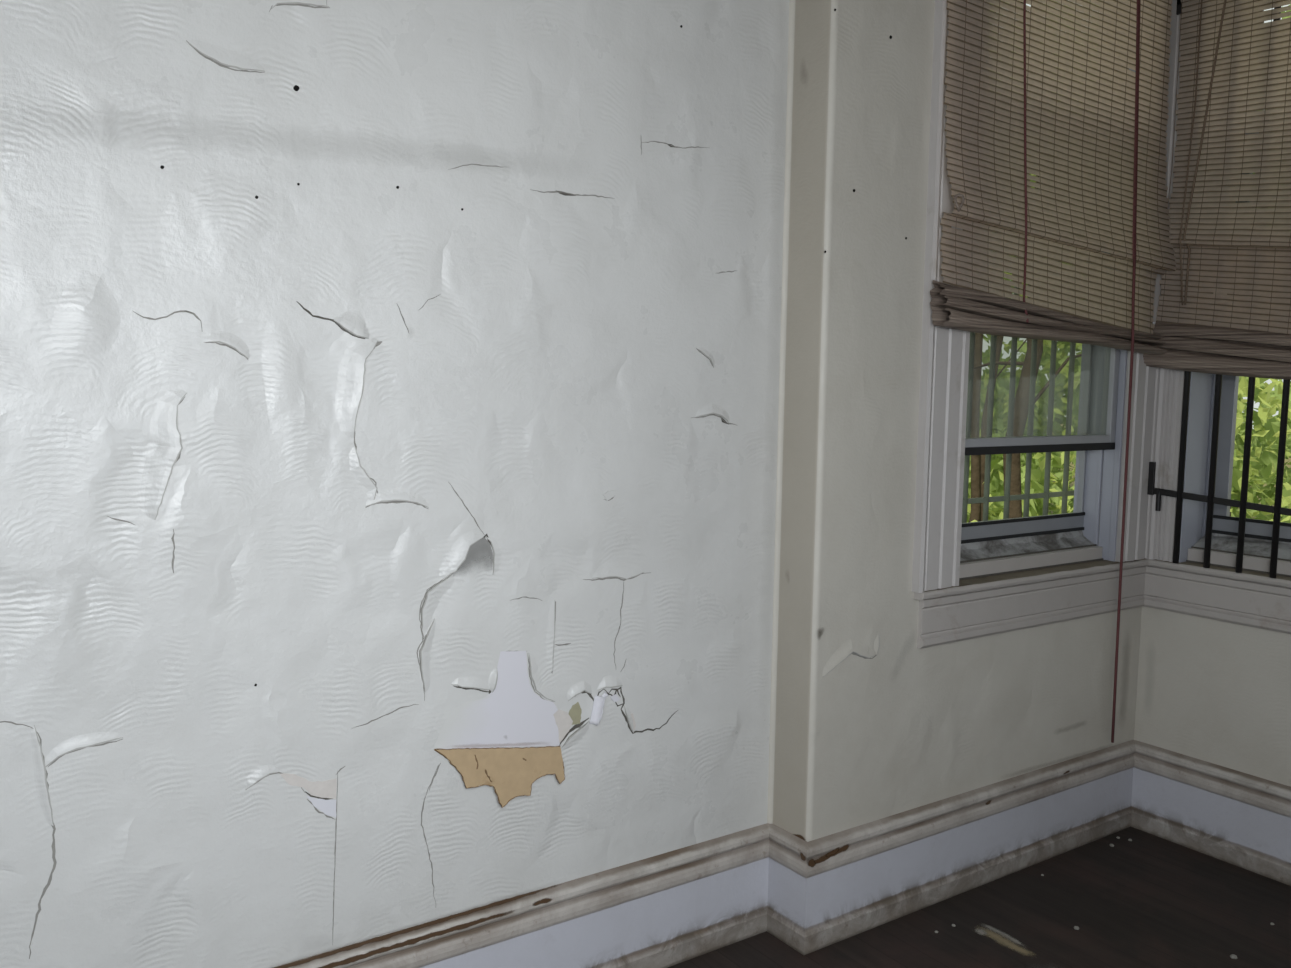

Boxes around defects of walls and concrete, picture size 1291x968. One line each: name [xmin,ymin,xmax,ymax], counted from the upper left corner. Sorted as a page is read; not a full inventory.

crack [186,39,265,73]
crack [269,0,330,12]
crack [530,189,615,199]
crack [641,140,707,155]
crack [132,310,250,360]
crack [296,295,484,534]
crack [692,403,738,426]
crack [583,560,678,734]
peeling [433,651,608,808]
crack [0,721,123,959]
peeling [245,764,345,937]
crack [421,763,441,903]